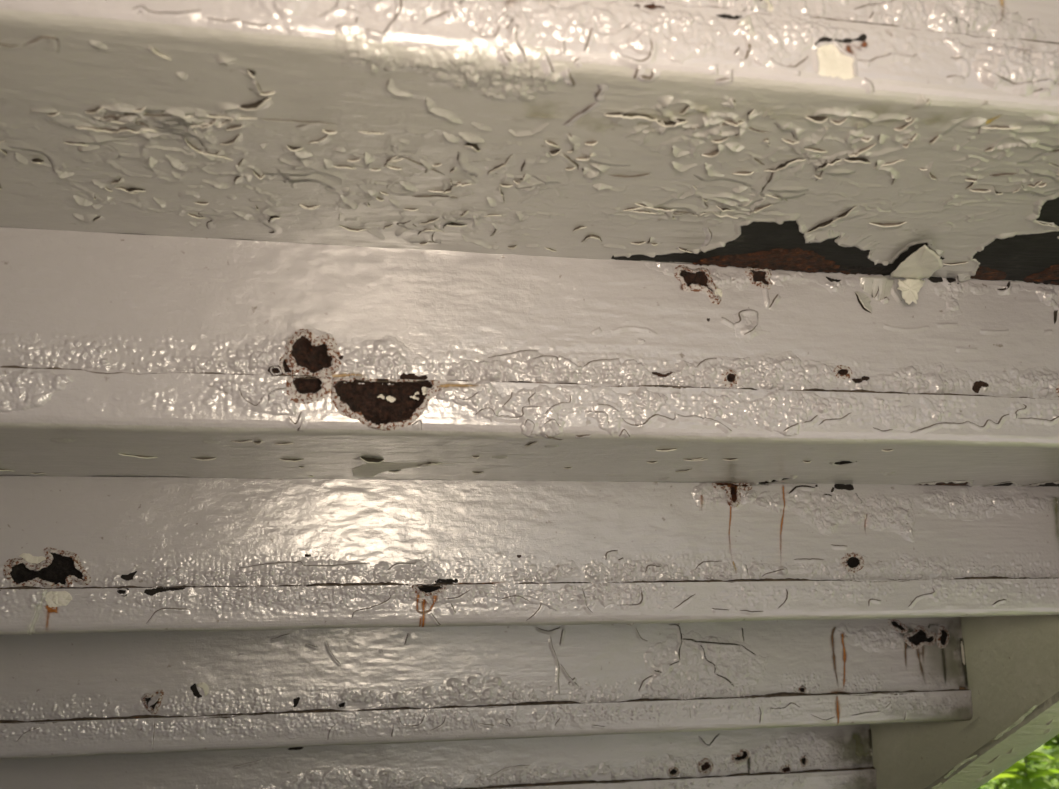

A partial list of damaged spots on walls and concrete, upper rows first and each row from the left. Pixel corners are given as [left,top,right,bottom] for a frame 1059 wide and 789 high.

peeling [812,39,858,80]
peeling [573,95,1059,314]
peeling [351,457,456,477]
peeling [19,553,46,564]
crack [378,589,472,653]
corrosion [416,594,437,627]
crack [605,544,848,693]
crack [908,586,937,609]
crack [991,598,1007,608]
crack [270,633,341,667]
crack [502,595,579,727]
crack [391,715,514,737]